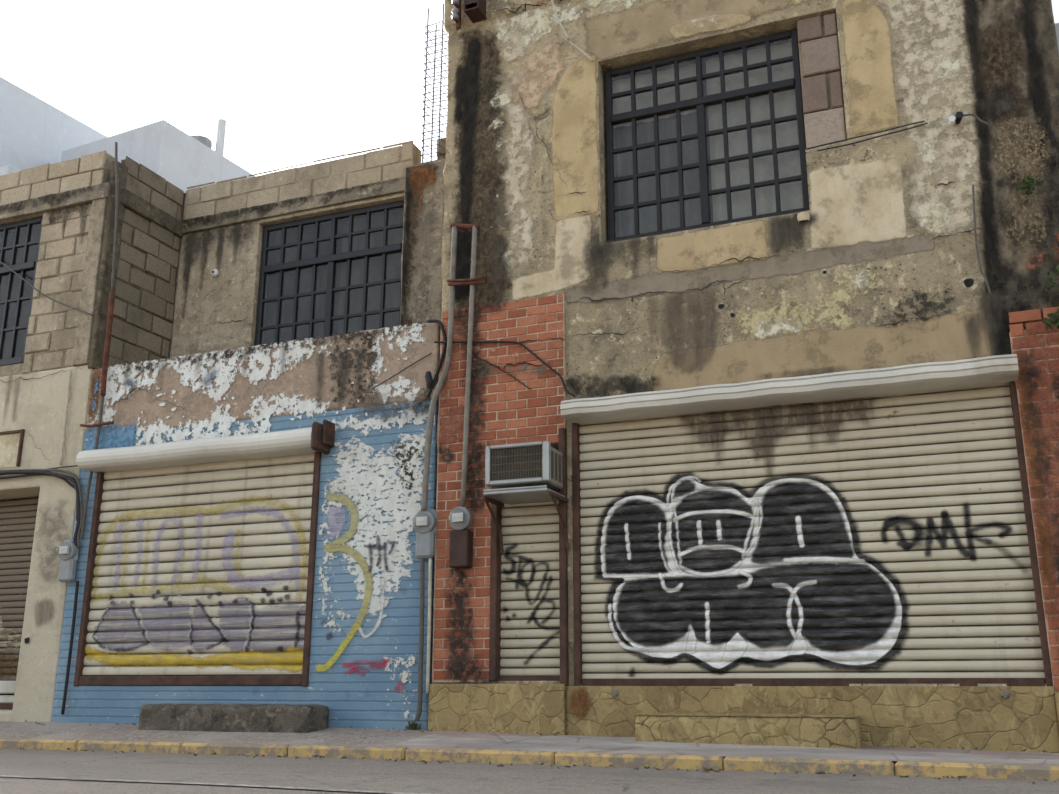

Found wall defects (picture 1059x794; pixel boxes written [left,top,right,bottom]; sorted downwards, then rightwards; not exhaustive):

crack [446,0,563,27]
damp [964,0,1059,356]
damp [111,164,437,417]
damp [449,0,638,512]
crack [570,255,781,303]
damp [736,270,891,340]
crack [453,327,643,371]
damp [566,375,657,398]
damp [682,399,872,467]
peeling [85,323,435,633]
corrosion [0,653,19,677]
peeling [384,638,417,720]